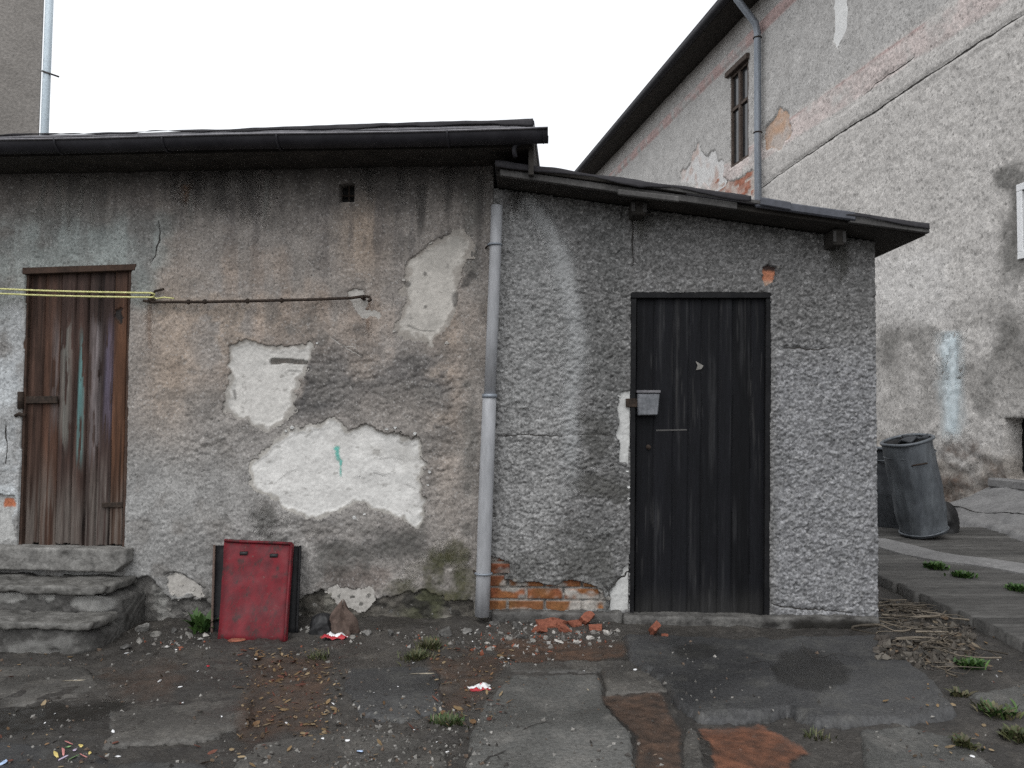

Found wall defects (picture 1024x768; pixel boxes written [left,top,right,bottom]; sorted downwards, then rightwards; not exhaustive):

flaking render [833,0,848,48]
flaking render [765,108,792,150]
crack [762,15,1023,188]
flaking render [681,143,754,197]
flaking render [392,229,475,348]
flaking render [762,265,780,286]
leakage [949,341,957,422]
flaking render [222,339,431,529]
flaking render [616,390,630,472]
flaking render [134,572,211,621]
flaking render [299,584,475,619]
flaking render [489,556,629,611]